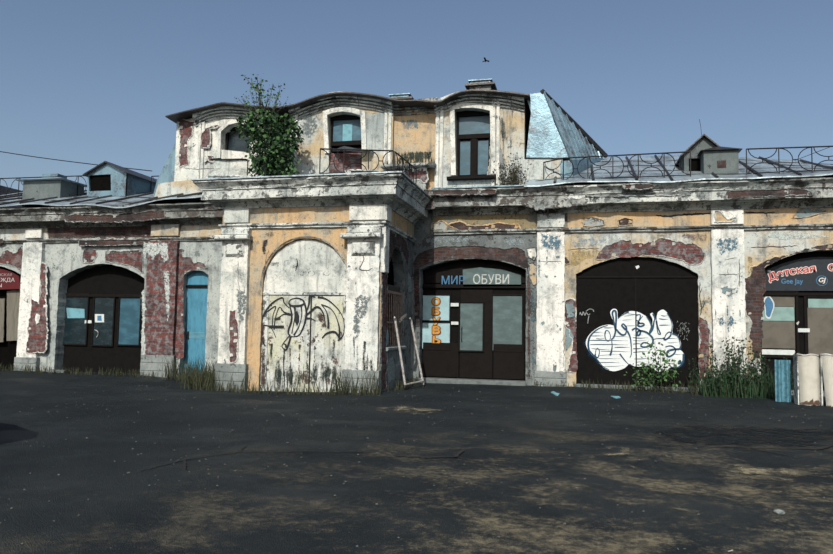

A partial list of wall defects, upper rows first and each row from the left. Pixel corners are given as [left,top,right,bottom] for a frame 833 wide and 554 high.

flaking render [178,119,219,168]
flaking render [0,246,23,271]
flaking render [25,262,49,354]
flaking render [47,215,208,360]
flaking render [228,289,246,364]
flaking render [555,237,706,266]
flaking render [698,316,711,383]
peeling [716,238,739,255]
flaking render [721,231,833,363]